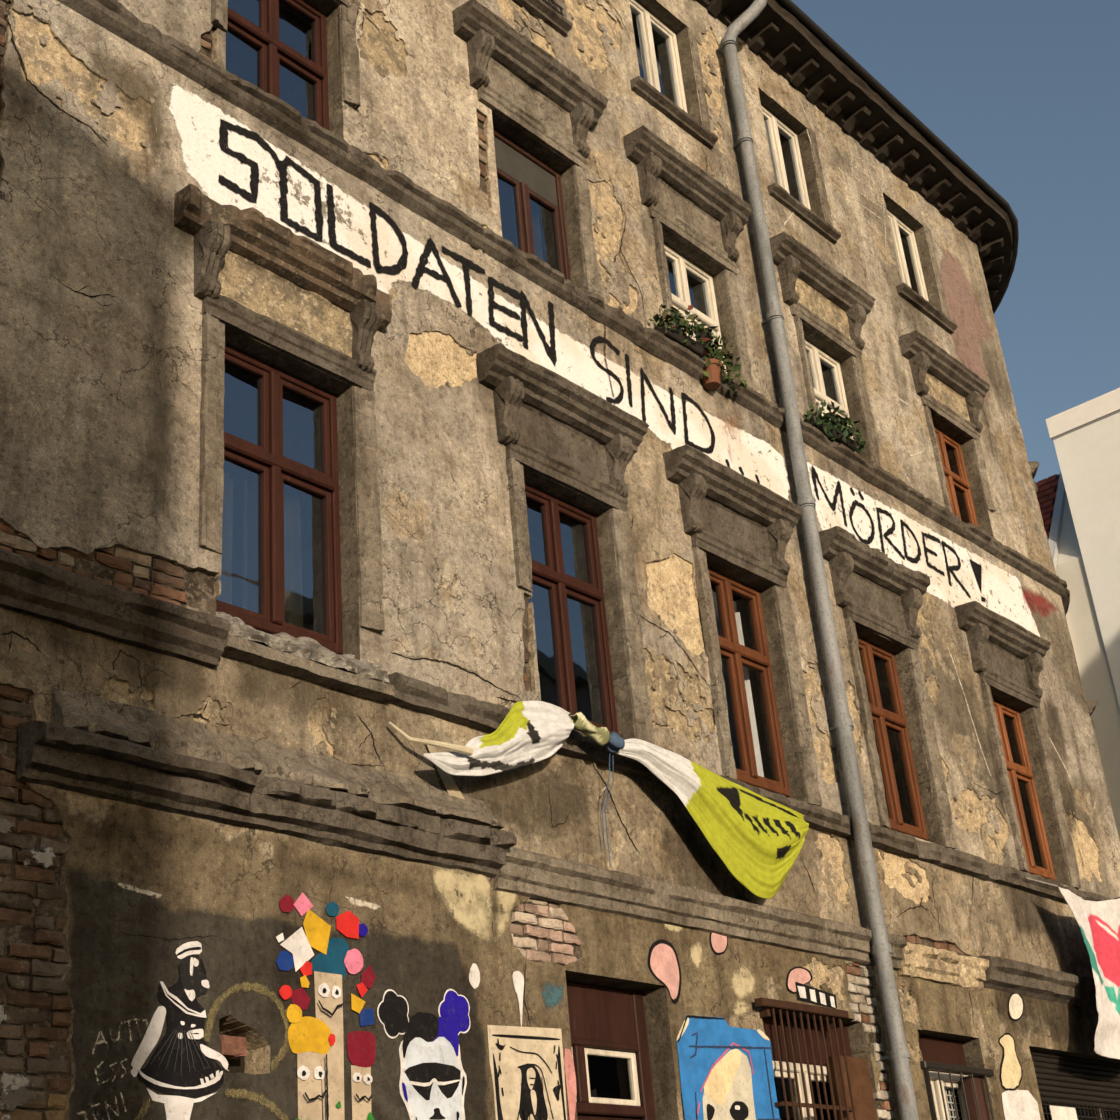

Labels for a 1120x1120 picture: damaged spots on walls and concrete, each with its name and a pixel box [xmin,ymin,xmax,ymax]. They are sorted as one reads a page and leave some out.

spalling [0,0,155,151]
spalling [356,3,414,78]
spalling [565,0,622,73]
spalling [588,180,638,319]
spalling [404,331,478,388]
spalling [646,554,708,663]
crack [108,649,176,704]
crack [177,701,230,726]
crack [391,651,520,703]
flaking render [0,684,72,1120]
flaking render [510,898,582,966]
peeling [878,851,937,909]